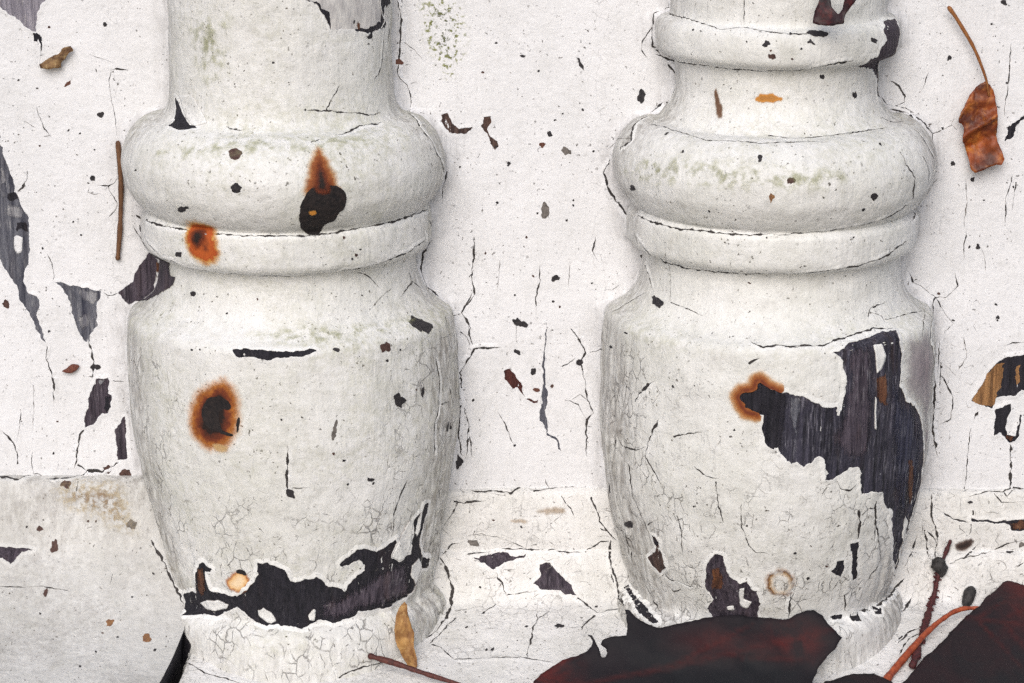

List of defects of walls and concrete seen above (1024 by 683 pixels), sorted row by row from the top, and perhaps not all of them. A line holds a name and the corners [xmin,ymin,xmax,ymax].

rust [299,148,347,235]
peeling [0,130,50,347]
peeling [118,252,182,304]
rust [185,223,219,265]
rust [189,381,240,452]
crack [276,445,301,499]
crack [364,236,1024,665]
rust [730,372,784,422]
peeling [740,328,943,584]
peeling [967,350,1024,446]
peeling [180,499,432,633]
crack [187,660,243,683]